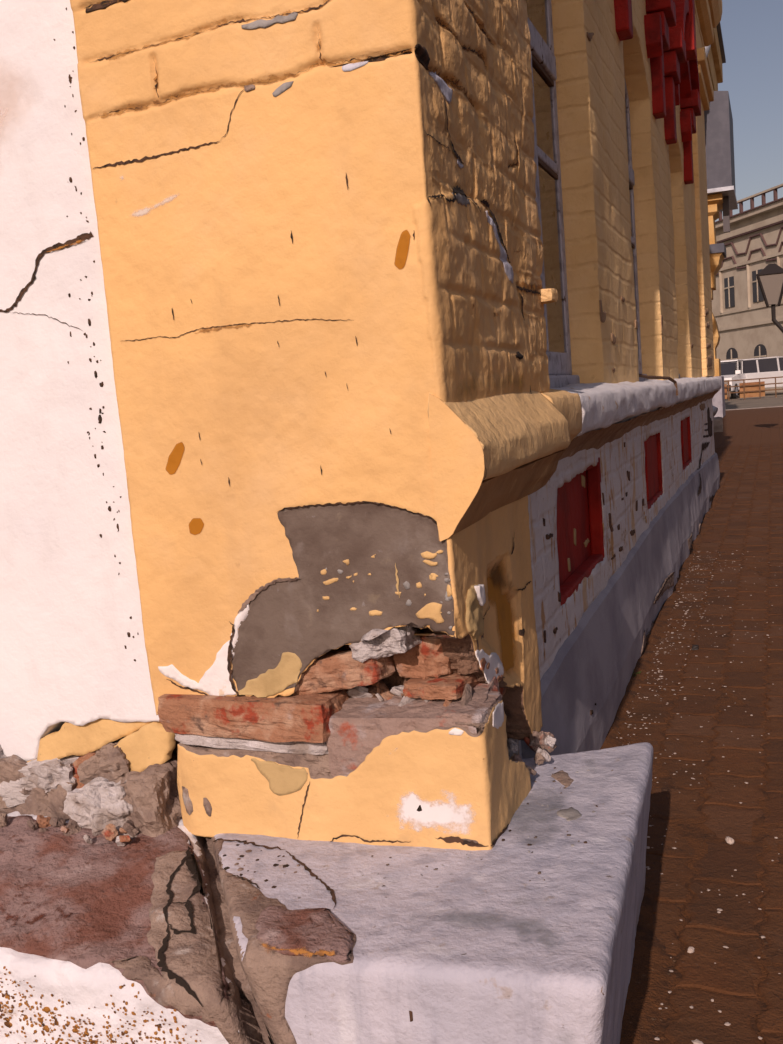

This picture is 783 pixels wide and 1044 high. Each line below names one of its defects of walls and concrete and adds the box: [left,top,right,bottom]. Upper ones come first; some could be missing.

crack [93,89,244,169]
crack [424,72,558,321]
crack [0,231,93,330]
crack [125,319,350,341]
flaking render [0,501,506,846]
spalling [507,731,590,793]
crack [330,835,411,843]
crack [436,821,510,847]
peeling [527,803,598,847]
crack [157,758,336,1044]